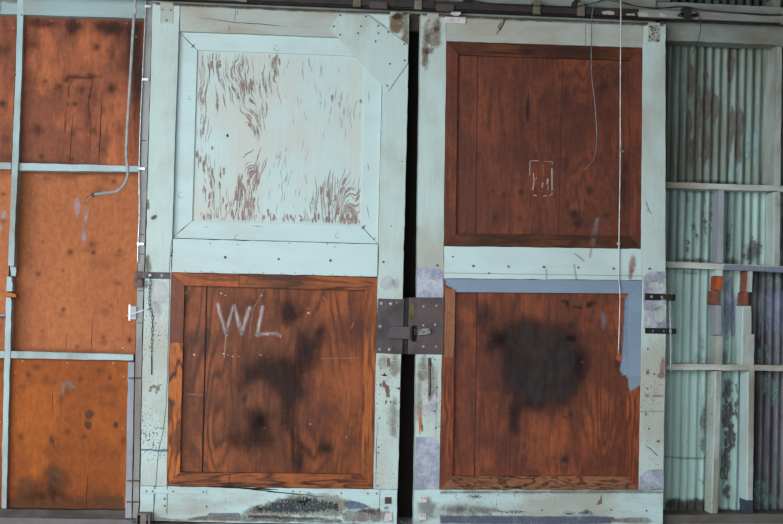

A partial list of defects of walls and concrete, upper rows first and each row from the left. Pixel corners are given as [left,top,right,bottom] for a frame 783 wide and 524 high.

corrosion [422,23,440,66]
peeling [195,53,363,225]
leakage [245,328,323,424]
leakage [487,319,582,429]
peeling [244,493,347,517]